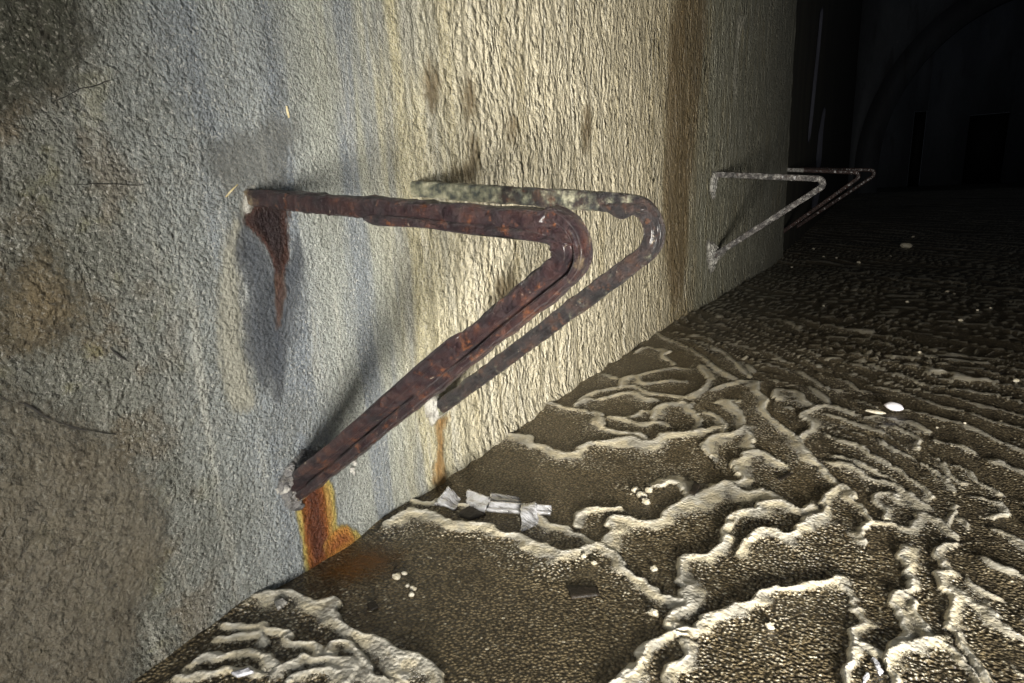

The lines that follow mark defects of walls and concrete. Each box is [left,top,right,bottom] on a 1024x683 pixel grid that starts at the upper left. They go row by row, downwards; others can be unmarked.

rust [242,206,290,326]
rust [362,214,573,246]
rust [601,203,647,219]
rust [292,332,462,487]
rust [295,480,361,572]